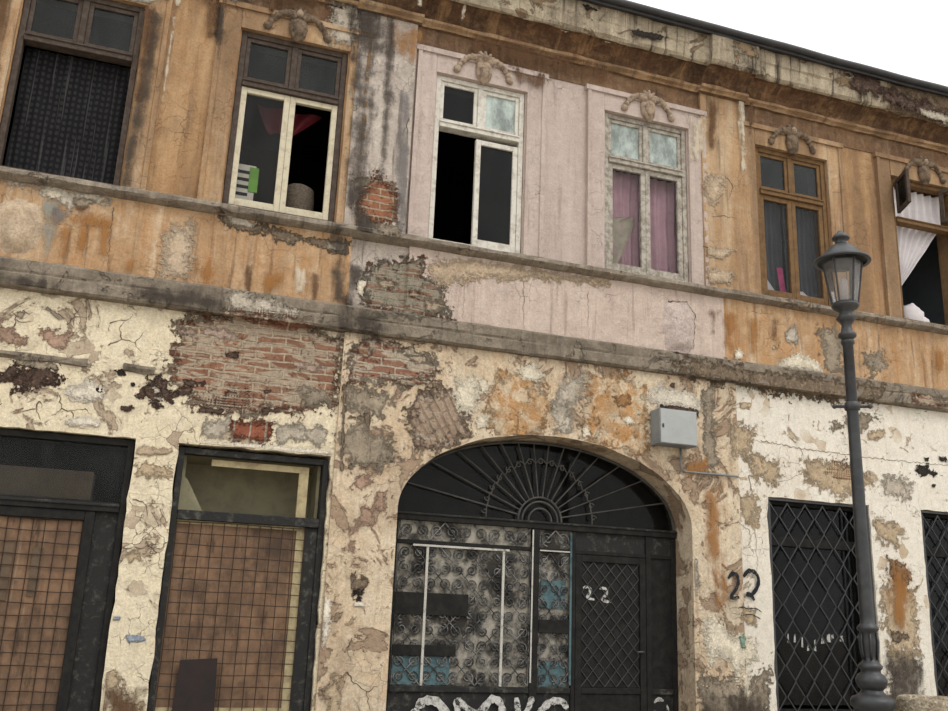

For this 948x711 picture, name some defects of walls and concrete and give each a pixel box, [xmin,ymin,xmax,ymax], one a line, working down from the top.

water stain [0,0,8,39]
water stain [205,0,237,45]
water stain [123,5,175,186]
water stain [270,0,422,229]
crack [0,395,90,420]
spalling [0,306,109,413]
crack [67,308,143,346]
flaking render [355,254,614,325]
flaking render [114,289,892,554]
peeling [863,456,948,503]
peeling [697,600,774,711]
peeling [872,511,926,711]